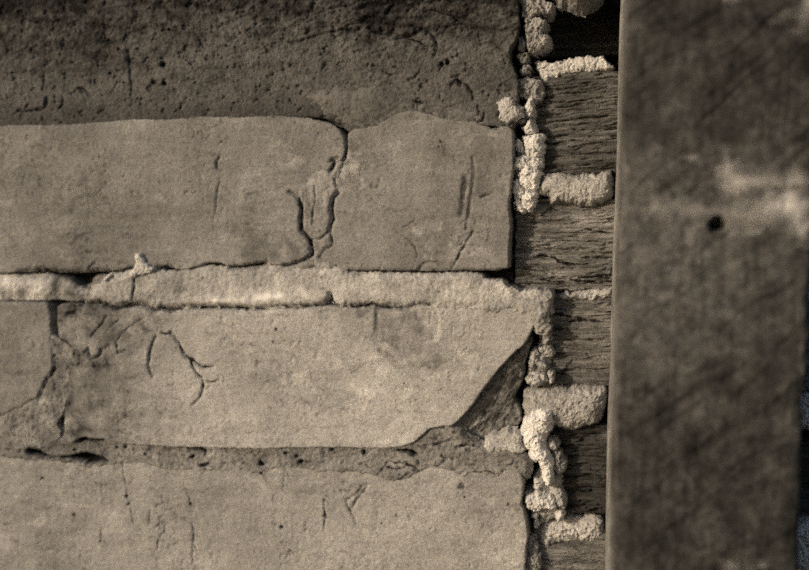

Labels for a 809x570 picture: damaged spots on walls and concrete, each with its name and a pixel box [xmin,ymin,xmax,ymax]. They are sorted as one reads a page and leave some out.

crack [292,192,339,264]
crack [29,264,431,363]
crack [148,332,215,404]
spalling [454,333,535,440]